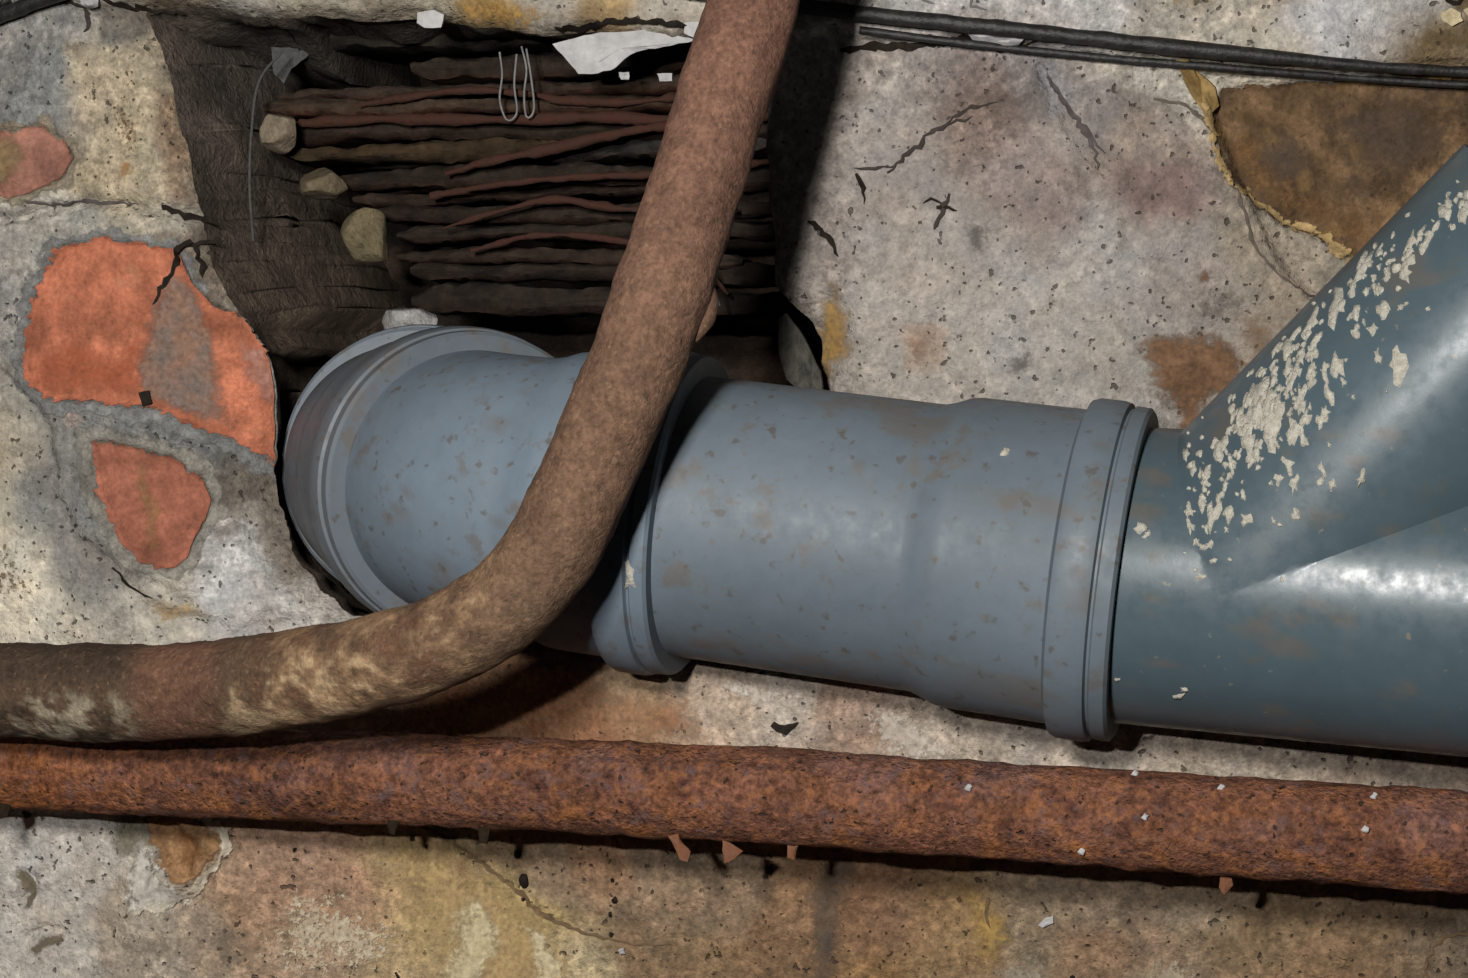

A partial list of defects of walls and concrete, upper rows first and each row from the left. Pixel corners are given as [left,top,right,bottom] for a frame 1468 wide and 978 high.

flaking render [417,10,445,28]
flaking render [553,16,699,81]
spalling [0,115,83,206]
crack [853,102,997,204]
spalling [1176,59,1468,263]
crack [24,199,224,305]
crack [807,220,838,257]
crack [923,193,957,229]
spalling [10,226,278,581]
corrosion [1141,335,1239,429]
spalling [134,815,233,915]